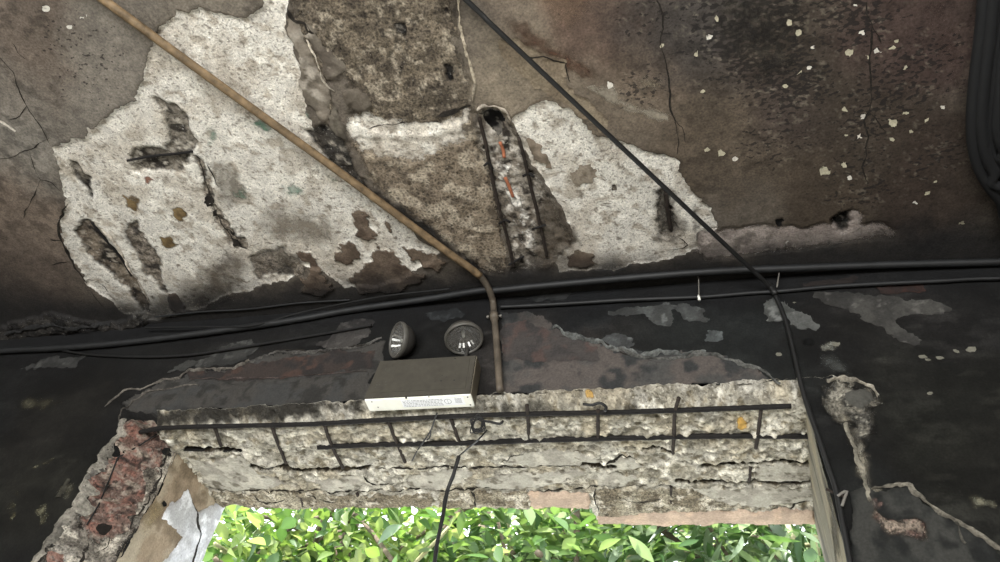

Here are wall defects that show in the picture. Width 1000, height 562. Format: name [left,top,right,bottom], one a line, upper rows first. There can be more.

crack [0,44,108,308]
flaking render [52,0,896,323]
crack [656,0,686,157]
crack [860,2,886,204]
flaking render [499,292,781,394]
peeling [803,275,952,346]
flaking render [31,318,531,562]
crack [79,445,836,562]
spalling [595,487,735,517]